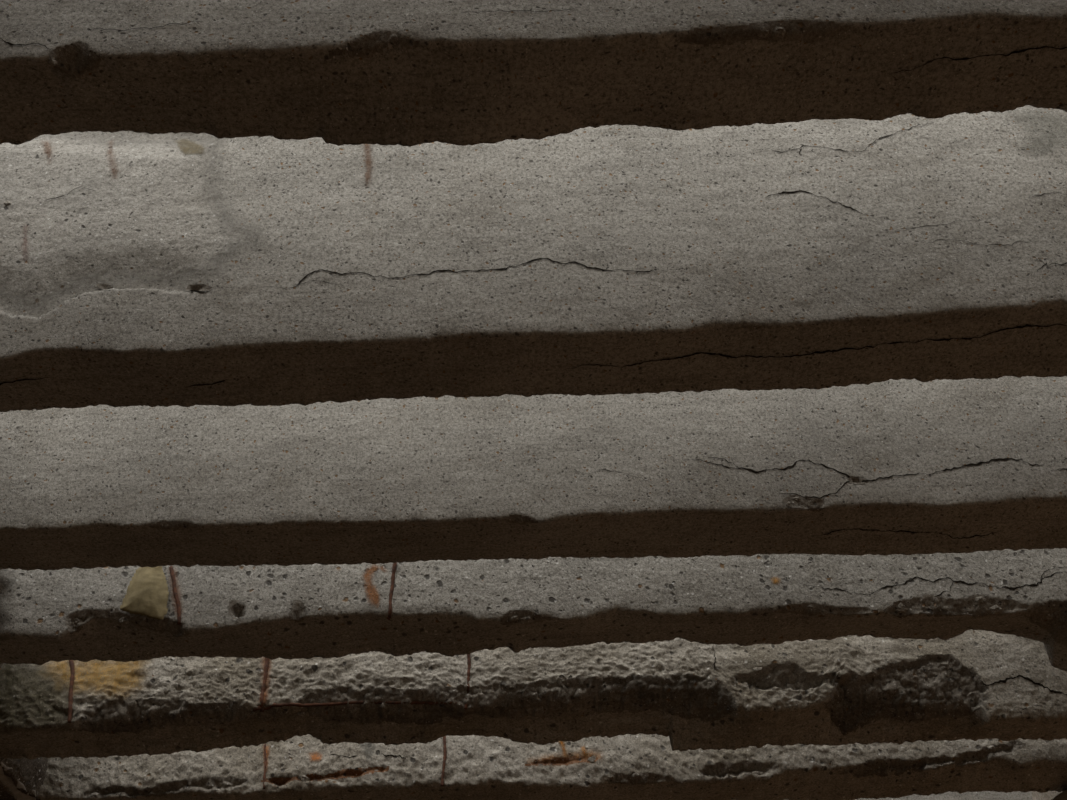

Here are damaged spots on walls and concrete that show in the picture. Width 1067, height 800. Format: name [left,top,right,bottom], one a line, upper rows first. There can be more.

crack [895,46,1067,73]
crack [767,190,863,214]
crack [886,220,1067,271]
crack [268,258,681,288]
crack [688,457,1067,499]
crack [812,528,1004,539]
corrosion [364,567,385,603]
crack [809,567,1064,597]
spalling [67,654,989,736]
spalling [525,755,598,766]
spalling [608,772,670,786]
spalling [700,760,778,780]